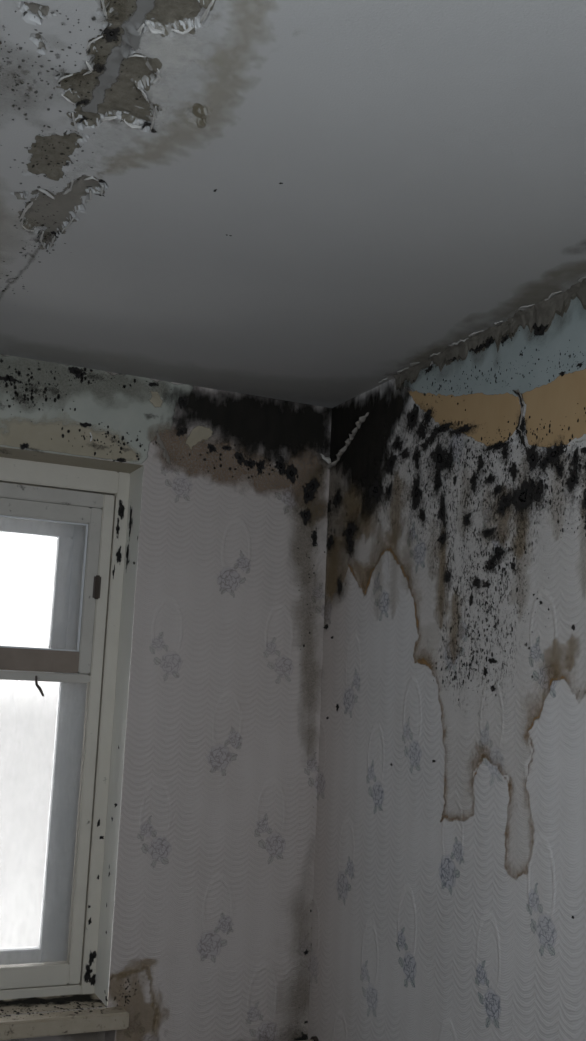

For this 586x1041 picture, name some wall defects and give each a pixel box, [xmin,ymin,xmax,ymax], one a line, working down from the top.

flaking render [10,0,216,258]
damp [135,33,198,119]
damp [533,322,555,336]
damp [0,330,586,745]